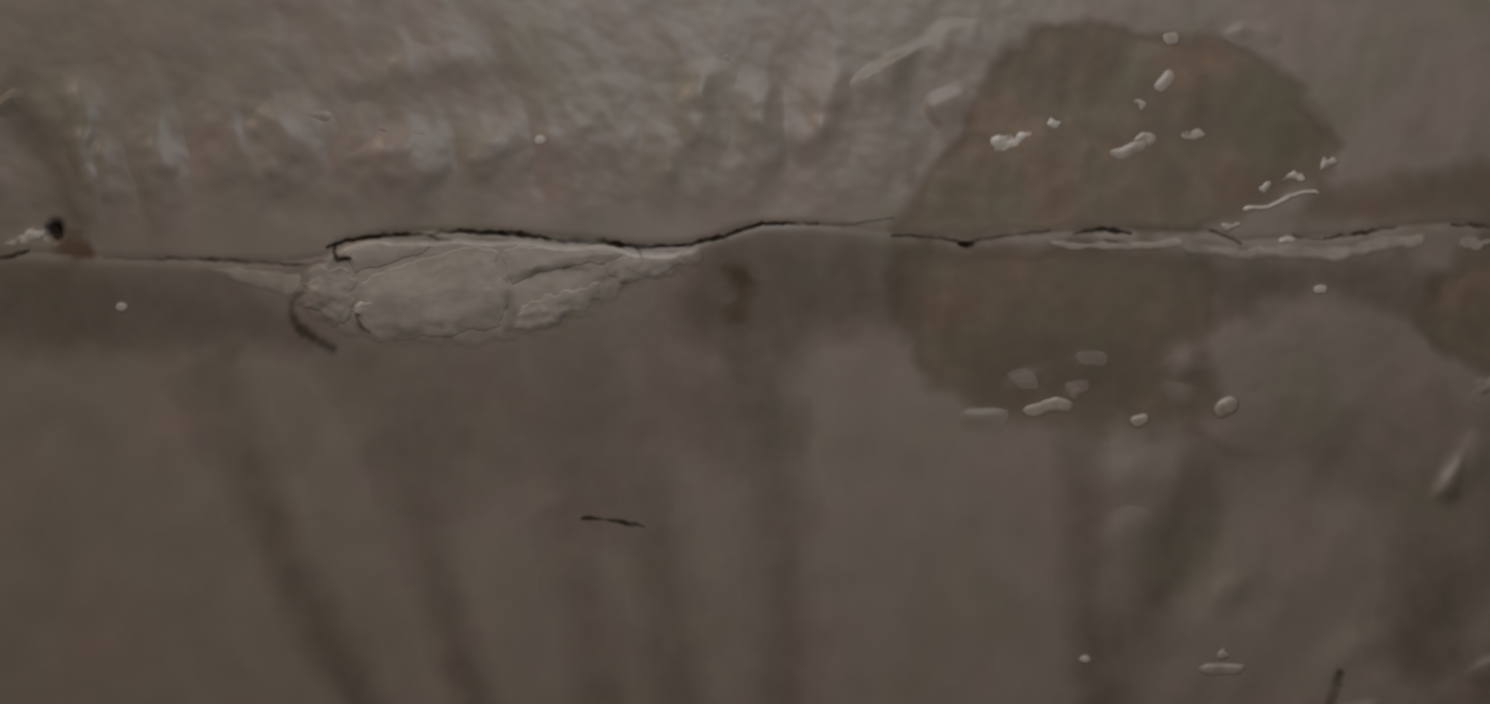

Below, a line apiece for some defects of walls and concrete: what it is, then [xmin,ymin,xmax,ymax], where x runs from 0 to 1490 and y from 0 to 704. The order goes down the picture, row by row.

crack [326,232,414,261]
crack [450,221,811,248]
crack [954,239,973,247]
crack [1083,226,1131,234]
crack [1337,229,1372,237]
peeling [202,238,704,350]